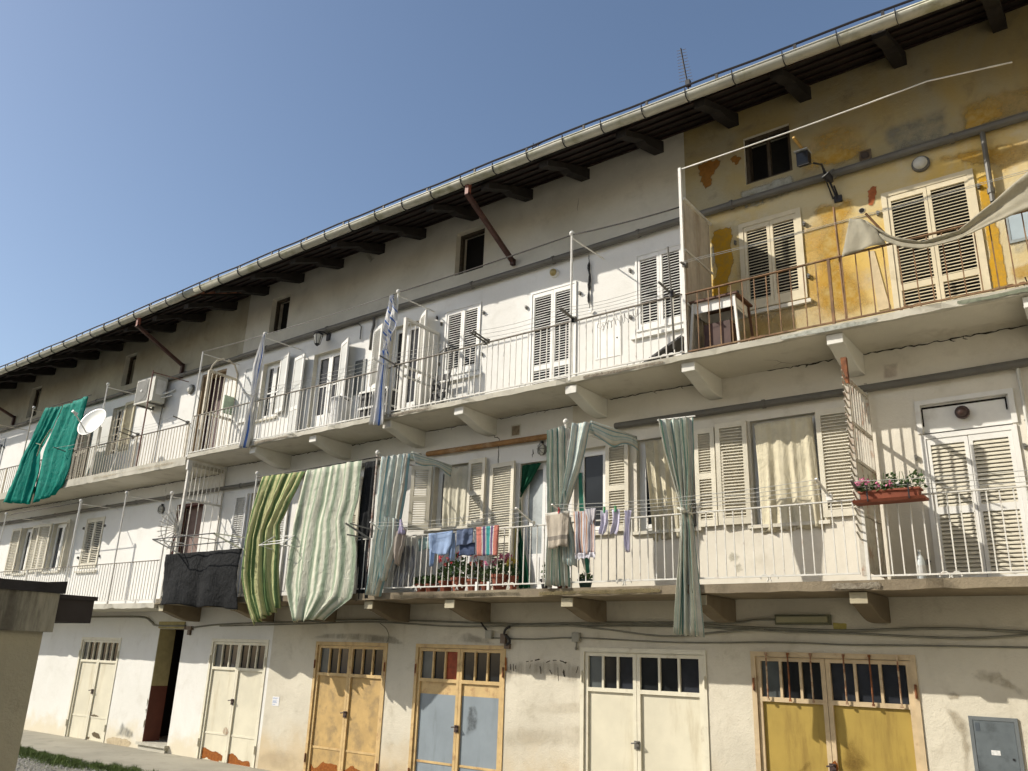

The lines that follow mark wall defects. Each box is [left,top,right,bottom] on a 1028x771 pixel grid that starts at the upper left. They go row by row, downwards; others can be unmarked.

peeling [698,155,741,189]
flaking render [867,186,877,205]